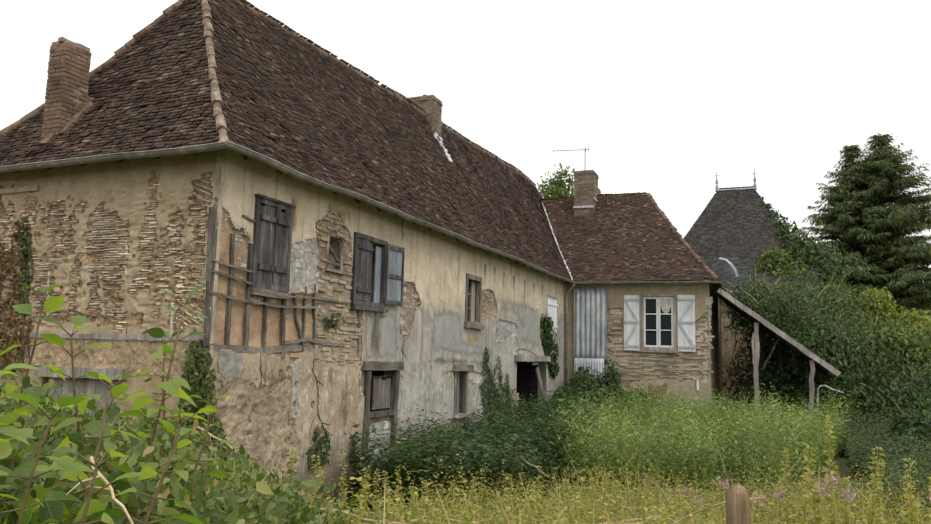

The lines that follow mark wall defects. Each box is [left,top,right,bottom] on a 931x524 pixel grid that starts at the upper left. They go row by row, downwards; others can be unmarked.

peeling [0,170,364,480]
flaking render [400,281,421,339]
crack [309,362,332,450]